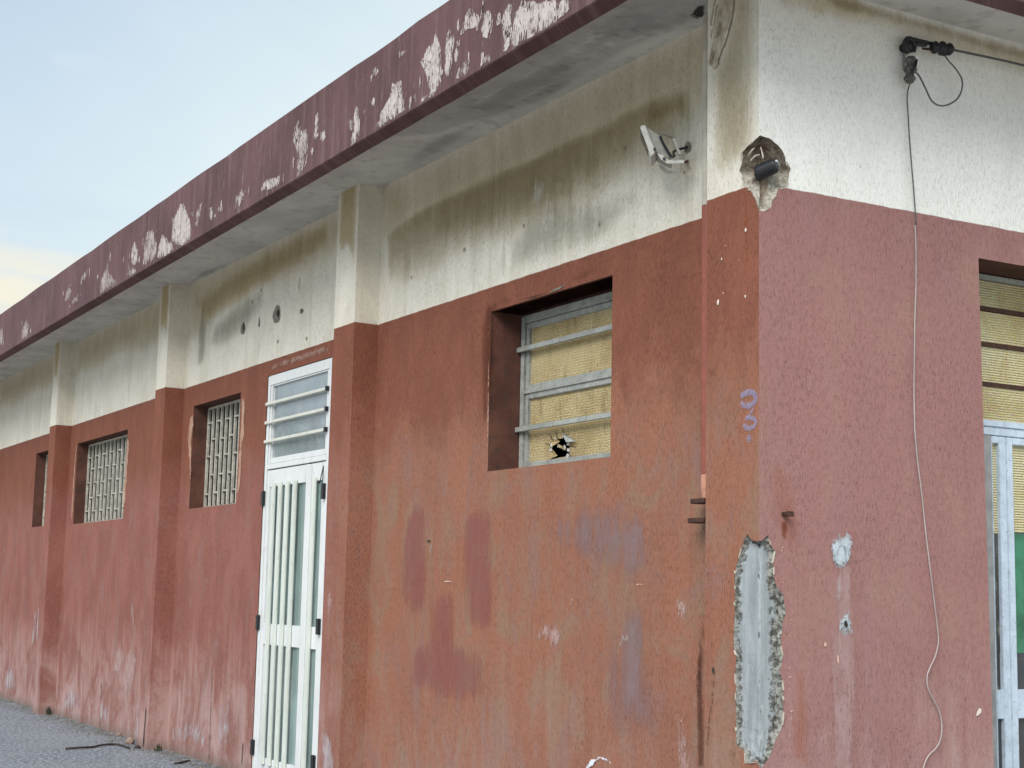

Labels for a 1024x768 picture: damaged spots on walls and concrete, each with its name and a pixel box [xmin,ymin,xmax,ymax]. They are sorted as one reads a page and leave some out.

peeling [350,0,570,144]
peeling [235,112,325,207]
spalling [740,136,791,211]
peeling [63,200,223,307]
spalling [733,535,786,768]